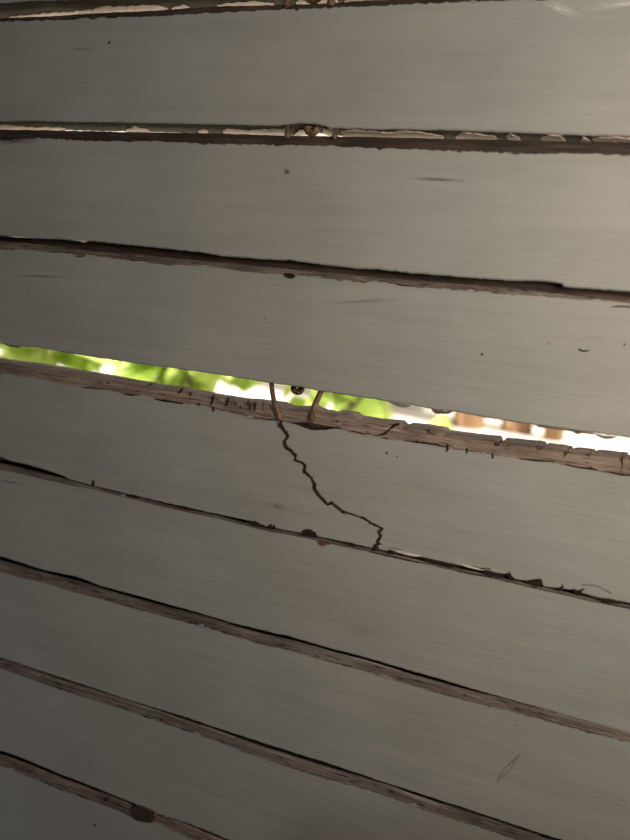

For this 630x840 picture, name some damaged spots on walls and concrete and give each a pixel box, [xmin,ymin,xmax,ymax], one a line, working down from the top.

crack [177,388,384,551]